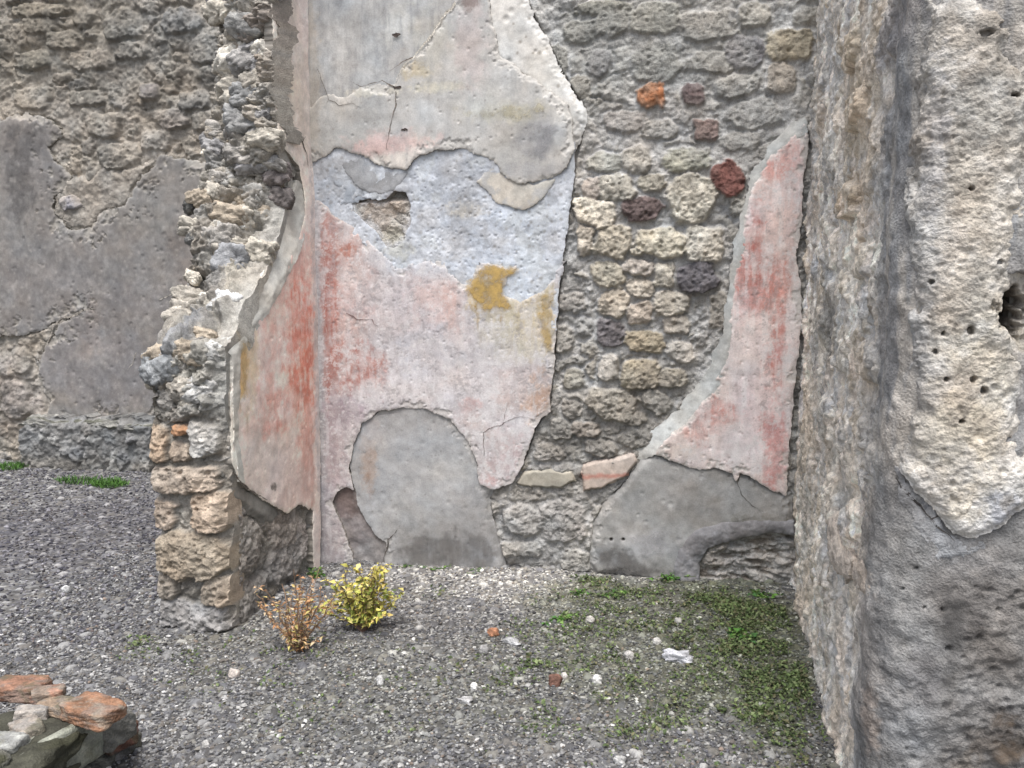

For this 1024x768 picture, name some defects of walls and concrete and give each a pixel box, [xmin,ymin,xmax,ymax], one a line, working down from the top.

crack [316,2,456,148]
spalling [308,0,588,331]
spalling [334,407,507,568]
spalling [589,455,794,578]